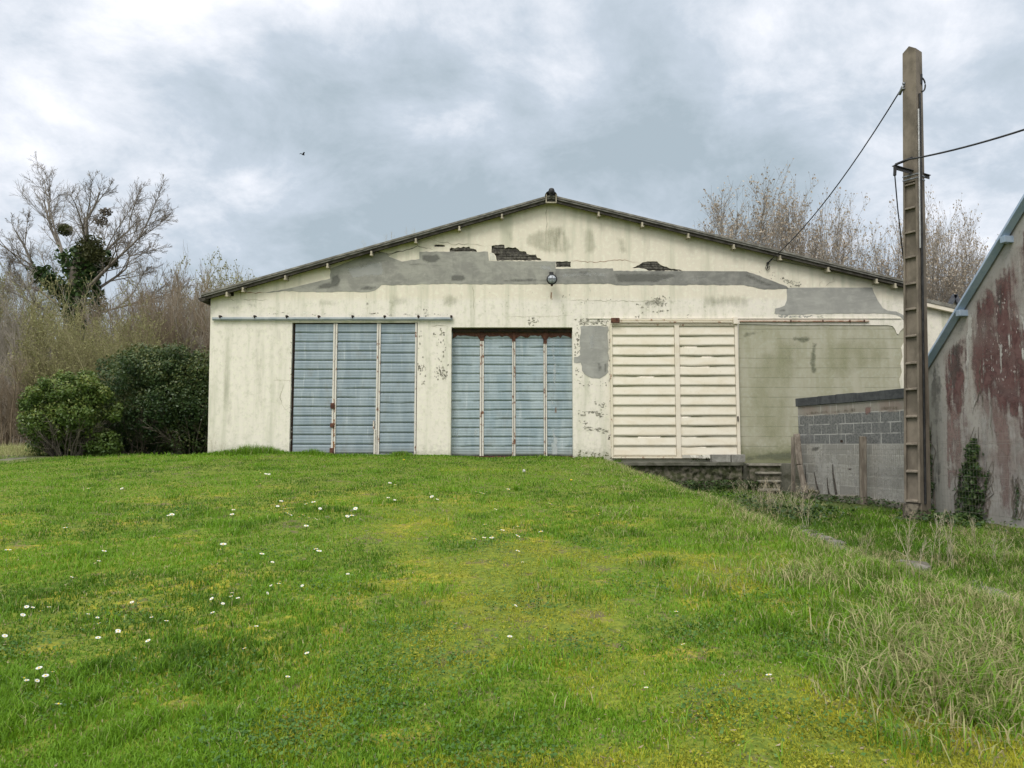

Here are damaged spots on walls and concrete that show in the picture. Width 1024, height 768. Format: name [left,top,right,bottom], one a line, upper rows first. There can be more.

spalling [490,245,541,261]
spalling [634,262,681,271]
peeling [417,328,449,385]
corrosion [453,332,572,344]
peeling [946,269,1024,505]
peeling [578,401,610,458]